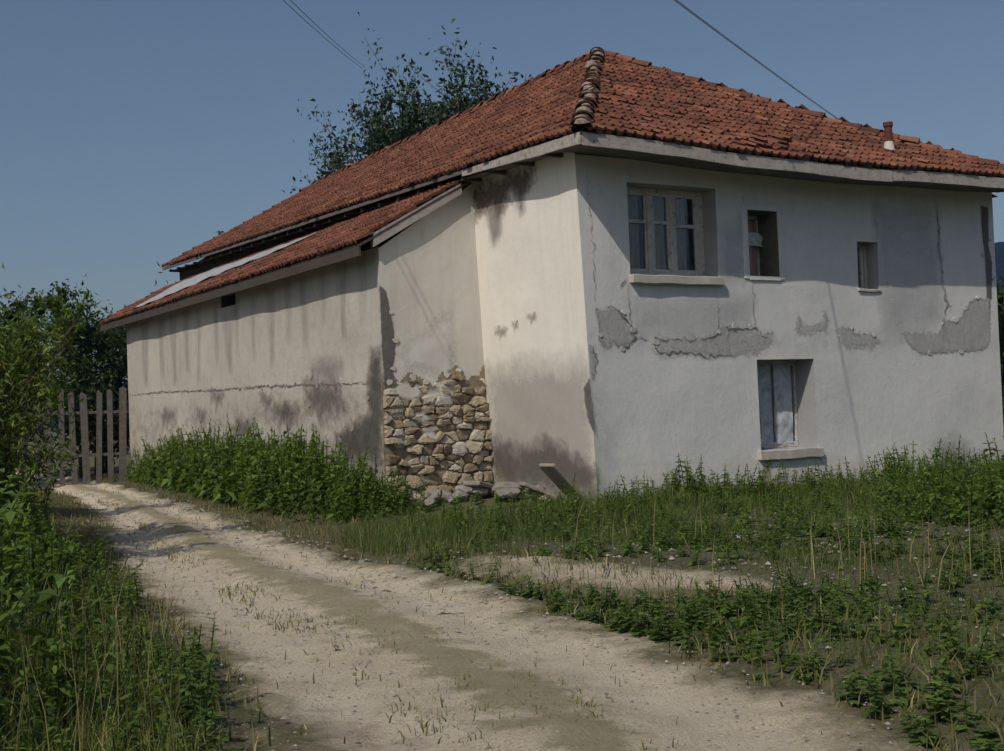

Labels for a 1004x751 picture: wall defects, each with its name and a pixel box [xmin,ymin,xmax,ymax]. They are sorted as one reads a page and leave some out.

leakage [473,168,532,215]
peeling [337,287,493,503]
spalling [584,304,773,430]
spalling [839,327,879,349]
crack [936,206,951,348]
spalling [903,206,995,355]